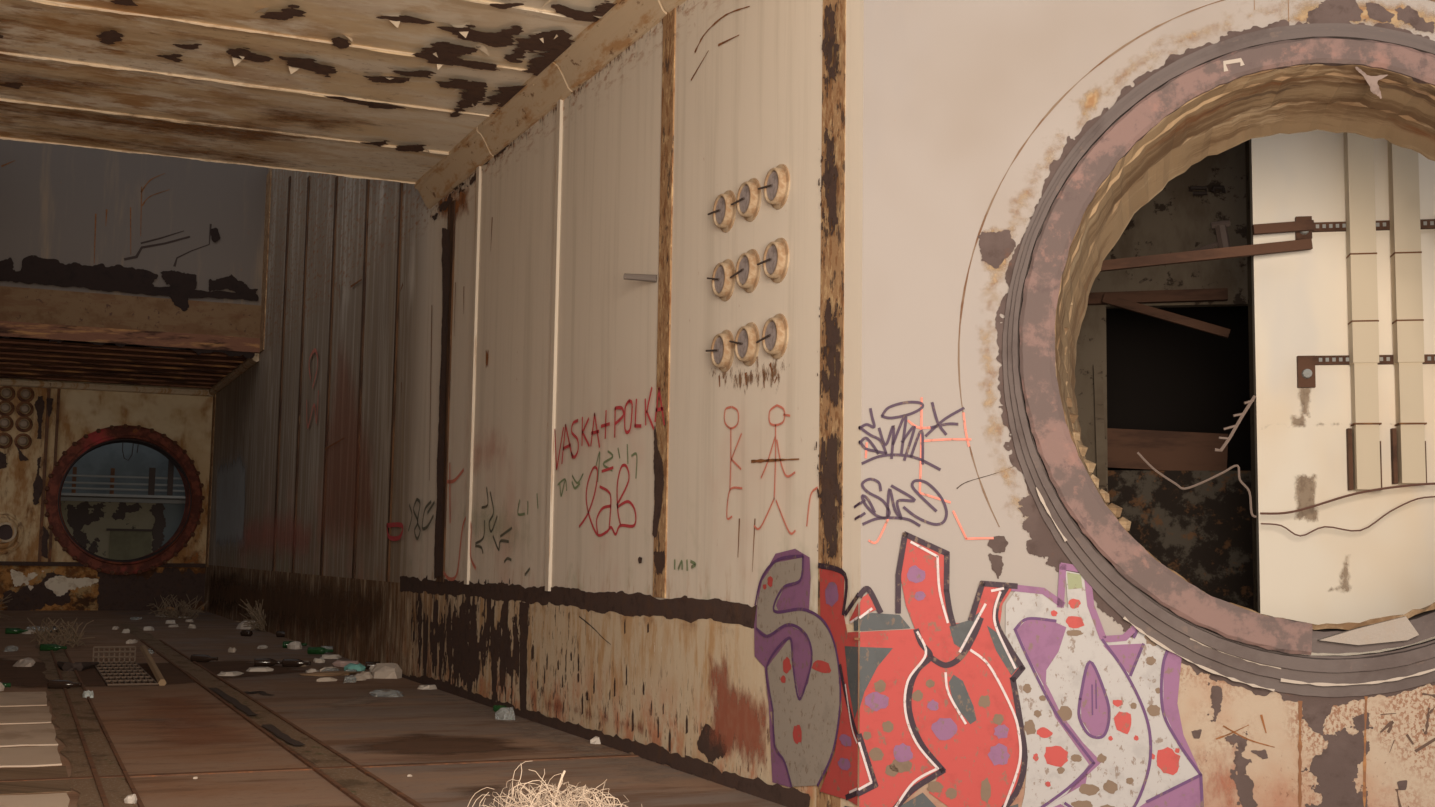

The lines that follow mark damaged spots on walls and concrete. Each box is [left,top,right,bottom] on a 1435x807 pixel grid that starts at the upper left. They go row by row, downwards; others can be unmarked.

peeling [254,5,307,20]
peeling [226,48,338,77]
peeling [364,0,617,117]
peeling [820,2,840,98]
rust [1083,90,1099,115]
rust [1352,4,1435,27]
peeling [818,128,842,239]
peeling [0,255,259,311]
peeling [978,0,1435,579]
peeling [2,526,206,611]
rust [697,663,766,763]
peeling [1092,588,1435,807]